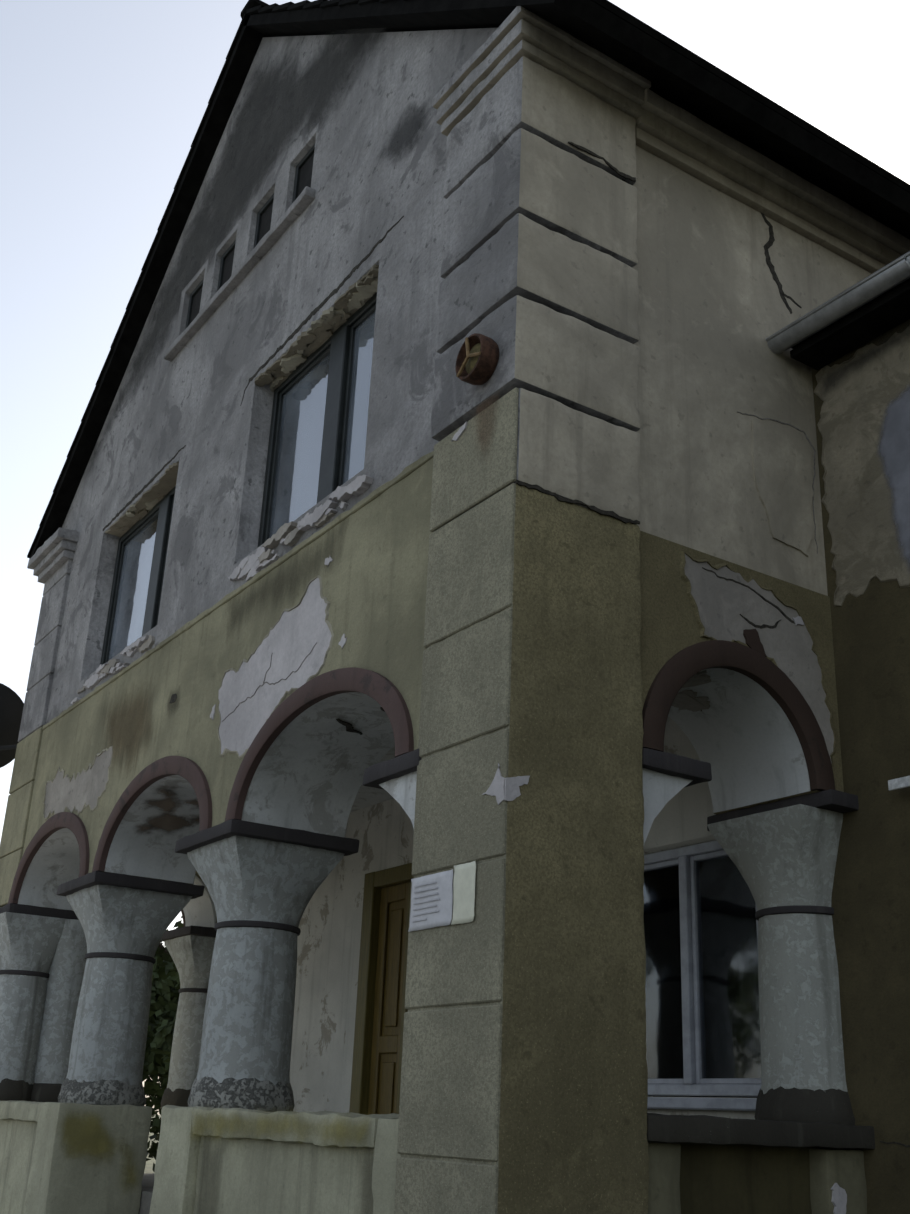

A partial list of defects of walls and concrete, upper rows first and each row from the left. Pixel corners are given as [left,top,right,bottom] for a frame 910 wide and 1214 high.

leakage [388,110,424,156]
crack [568,141,636,182]
crack [761,213,802,314]
flaking render [813,328,910,607]
flaking render [210,556,347,759]
flaking render [679,551,836,765]
flaking render [43,746,113,820]
flaking render [482,763,530,805]
flaking render [831,1183,847,1214]